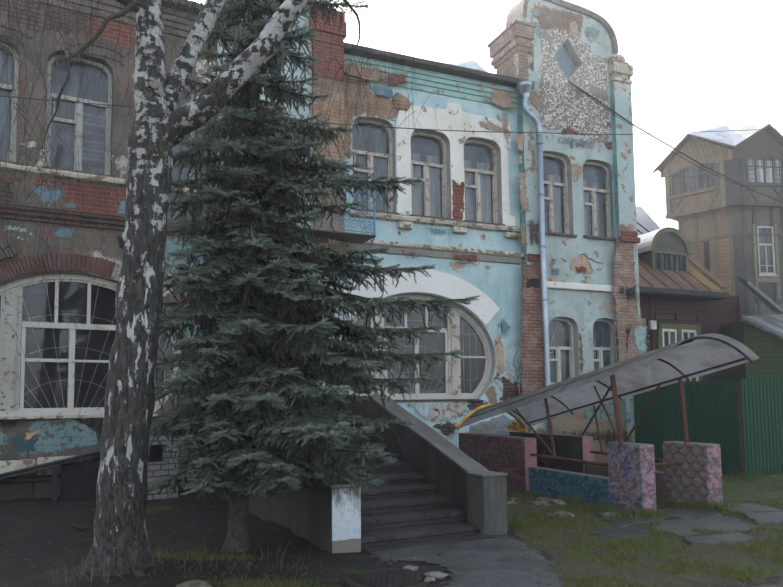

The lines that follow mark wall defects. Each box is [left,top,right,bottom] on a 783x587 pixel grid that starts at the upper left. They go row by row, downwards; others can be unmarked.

spalling [344,59,408,158]
flaking render [479,120,504,132]
spalling [23,176,126,217]
spalling [447,180,467,222]
flaking render [512,127,536,249]
spalling [448,243,491,273]
spalling [466,223,649,413]
spalling [433,421,458,440]
spalling [469,414,520,436]